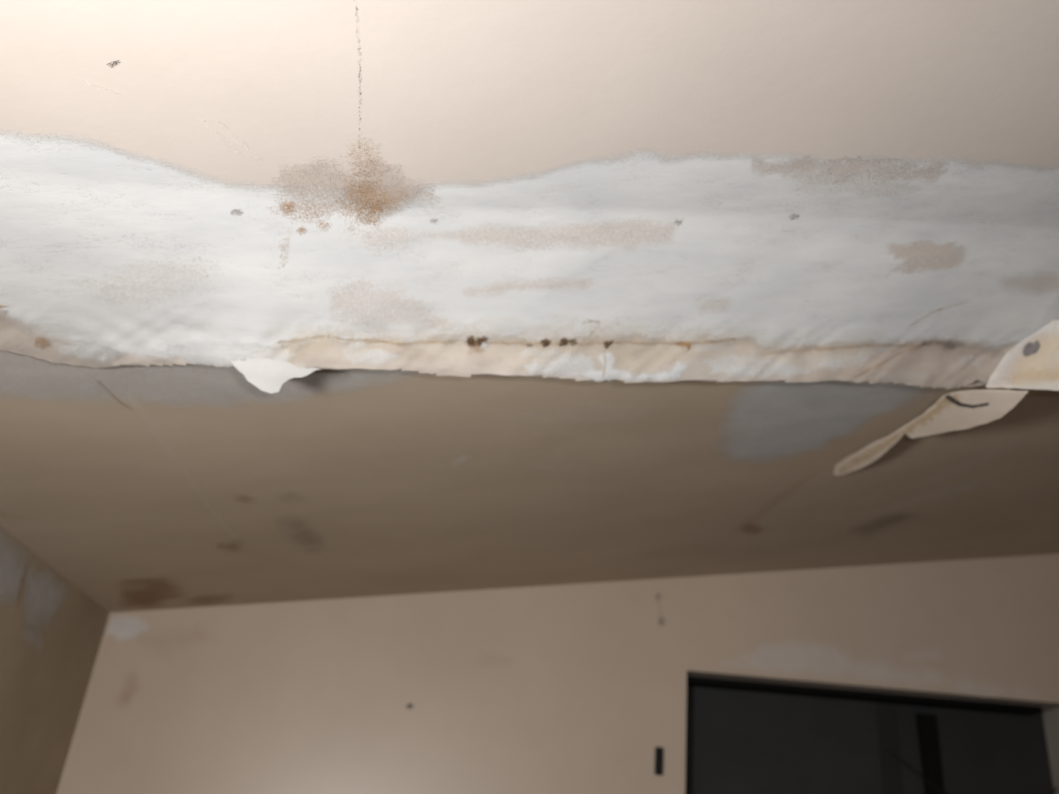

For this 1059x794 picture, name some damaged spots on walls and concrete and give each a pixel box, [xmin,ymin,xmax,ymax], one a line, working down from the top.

water stain [266,137,684,268]
peeling [0,310,1020,393]
water stain [252,275,1059,473]